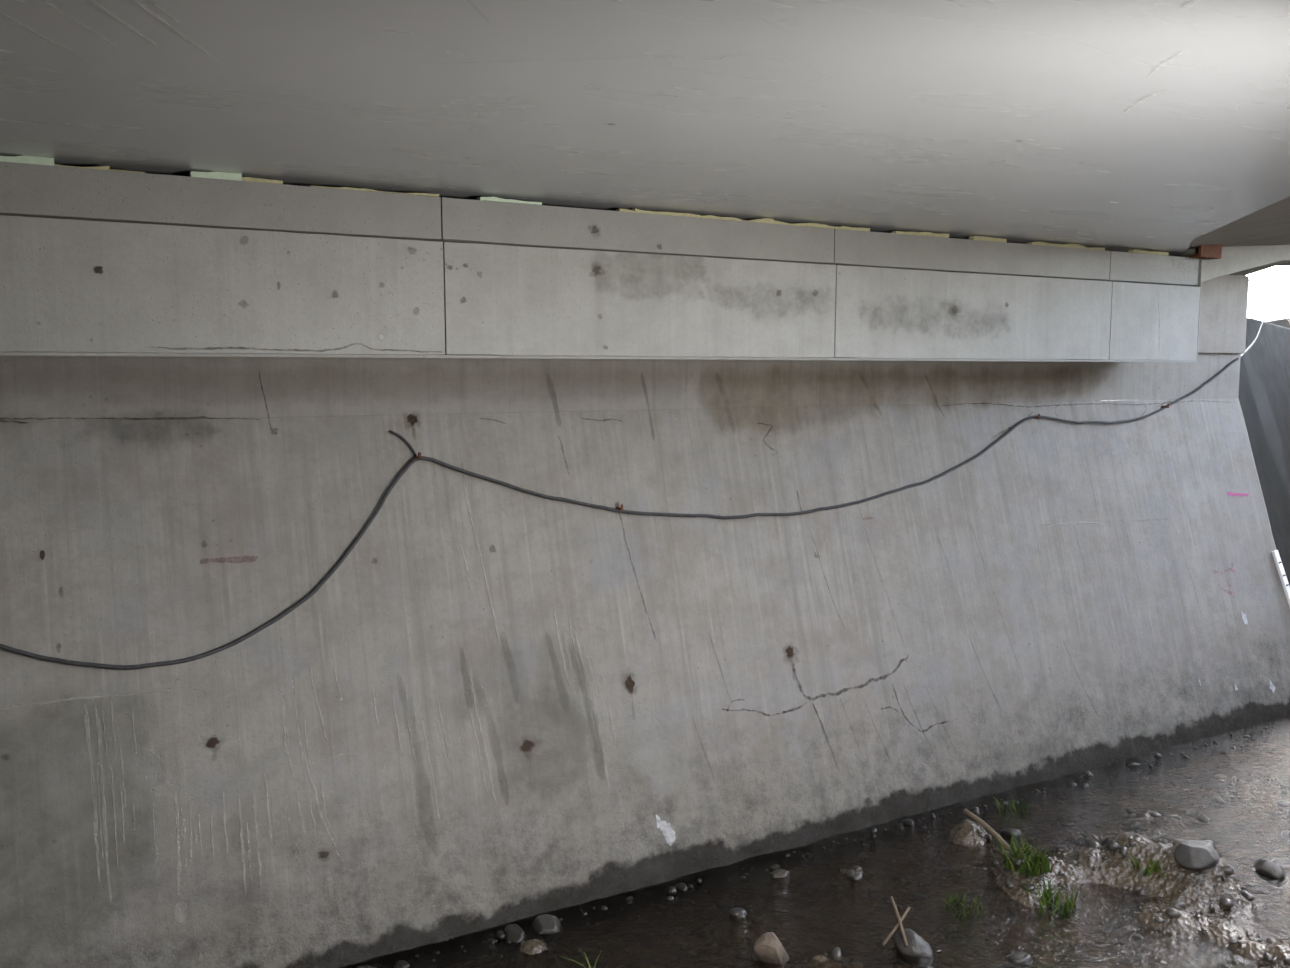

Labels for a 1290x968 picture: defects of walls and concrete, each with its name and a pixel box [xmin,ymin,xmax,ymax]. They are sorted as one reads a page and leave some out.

crack [723,655,946,732]
water stain [286,699,1290,968]